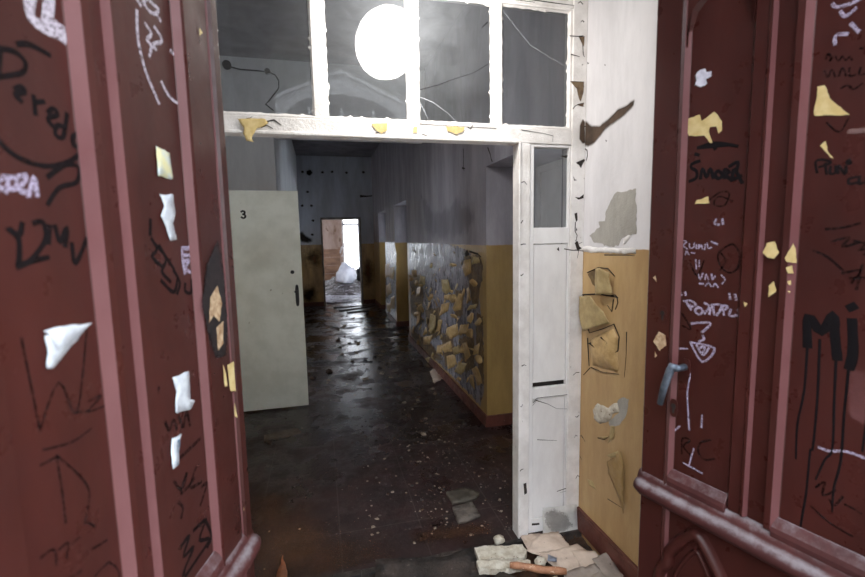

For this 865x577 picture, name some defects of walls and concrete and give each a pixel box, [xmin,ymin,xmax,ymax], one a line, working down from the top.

peeling [238,118,268,142]
spalling [571,81,584,107]
spalling [574,189,637,256]
peeling [385,241,396,320]
peeling [409,242,484,406]
peeling [593,397,629,511]